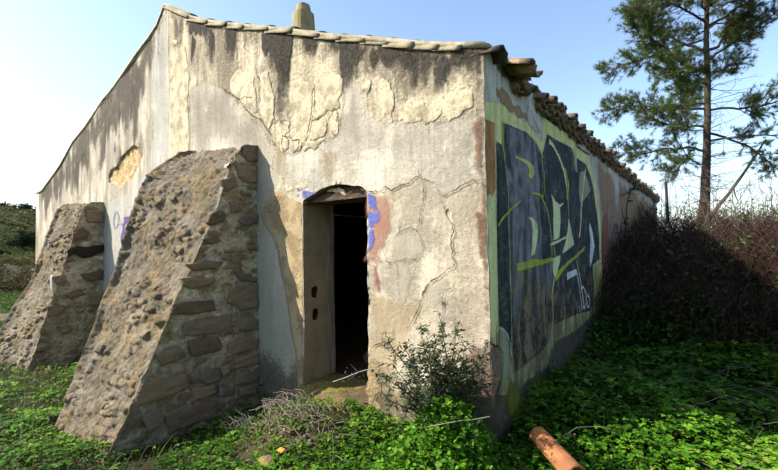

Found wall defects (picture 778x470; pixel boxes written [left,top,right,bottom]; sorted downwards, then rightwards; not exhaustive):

leakage [42,41,159,217]
spalling [108,145,143,188]
leakage [174,17,215,63]
leakage [225,29,236,55]
flaking render [230,67,343,152]
leakage [261,30,317,122]
leakage [327,40,480,89]
flaking render [360,77,473,125]
peeling [261,177,368,389]
crack [367,155,476,347]